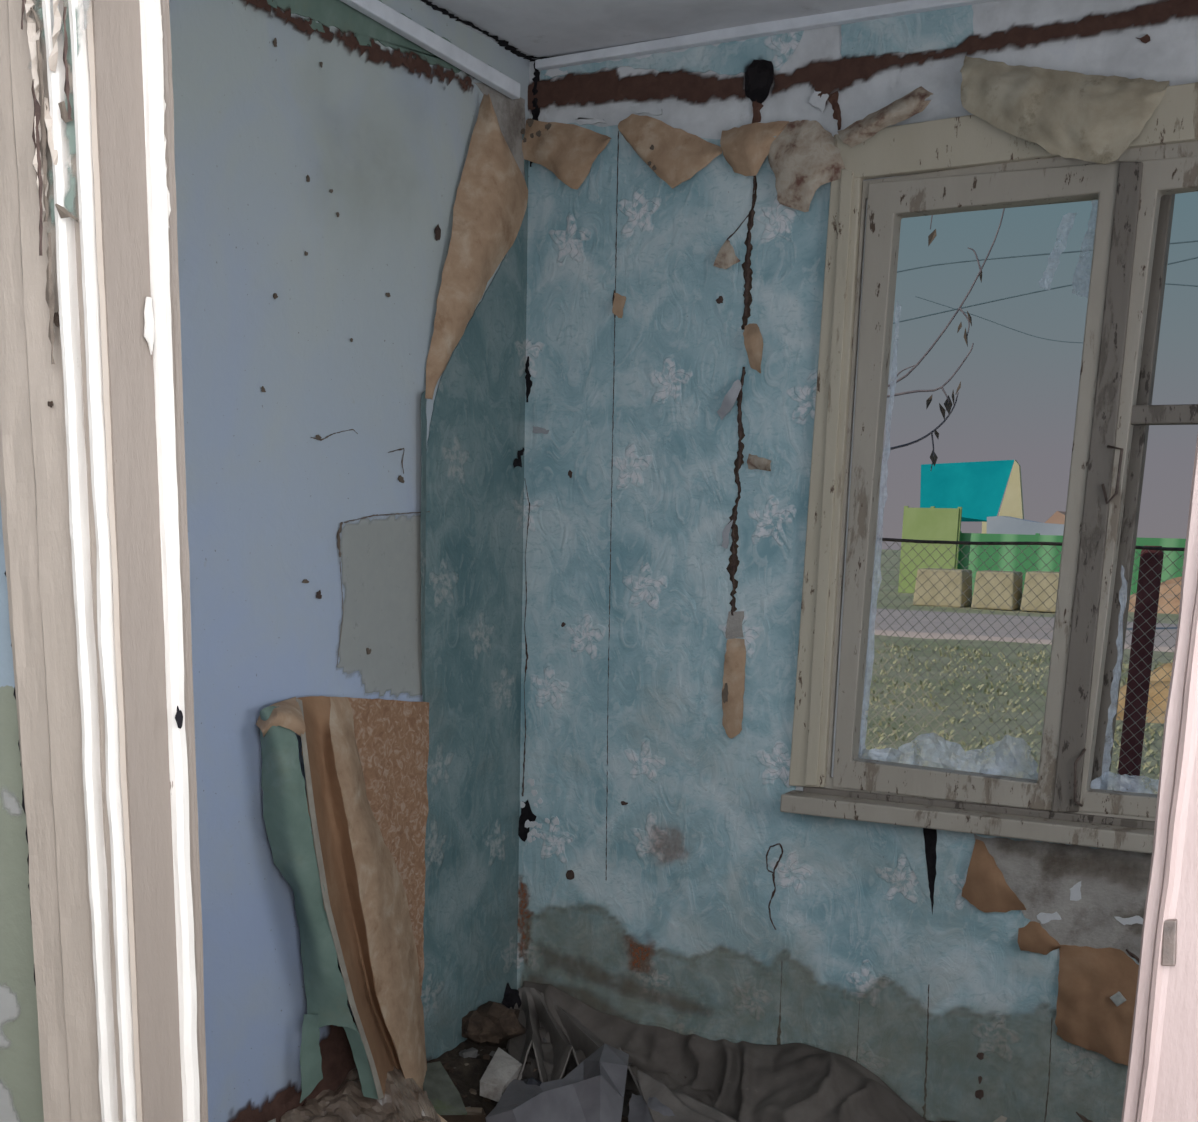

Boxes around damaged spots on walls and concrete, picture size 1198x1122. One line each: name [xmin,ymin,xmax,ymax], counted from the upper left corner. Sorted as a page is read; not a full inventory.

spalling [242,0,746,179]
spalling [771,0,1198,130]
peeling [21,0,90,364]
crack [727,176,757,330]
crack [524,356,532,402]
crack [722,367,746,616]
peeling [337,511,430,697]
crack [513,448,530,796]
spalling [974,834,1152,963]
peeling [0,986,20,1047]
water stain [535,932,701,1035]
peeling [0,1082,20,1122]